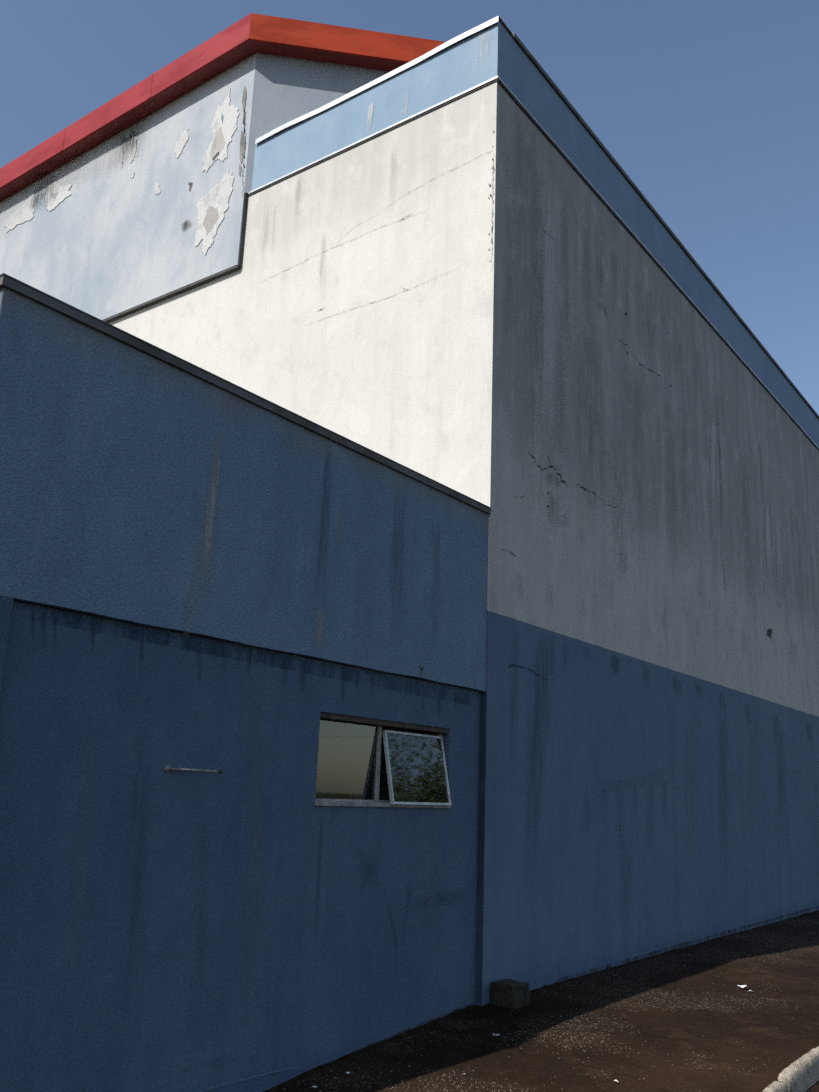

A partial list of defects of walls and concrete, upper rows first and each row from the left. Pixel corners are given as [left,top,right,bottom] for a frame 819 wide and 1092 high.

peeling [195,86,246,255]
crack [515,453,614,507]